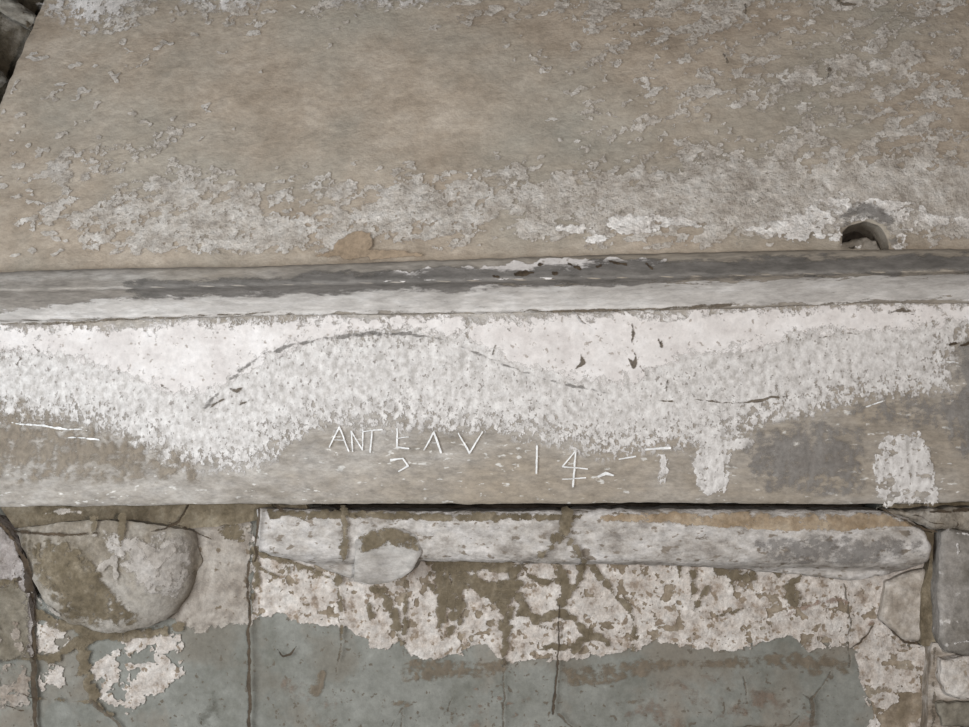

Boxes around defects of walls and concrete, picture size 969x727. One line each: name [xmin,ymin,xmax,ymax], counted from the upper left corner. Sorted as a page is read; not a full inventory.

crack [151,505,211,539]
crack [0,523,98,727]
crack [88,700,122,727]
crack [246,504,284,727]
crack [499,657,507,727]
peeling [91,522,925,727]
crack [552,594,572,727]
crack [735,583,937,727]